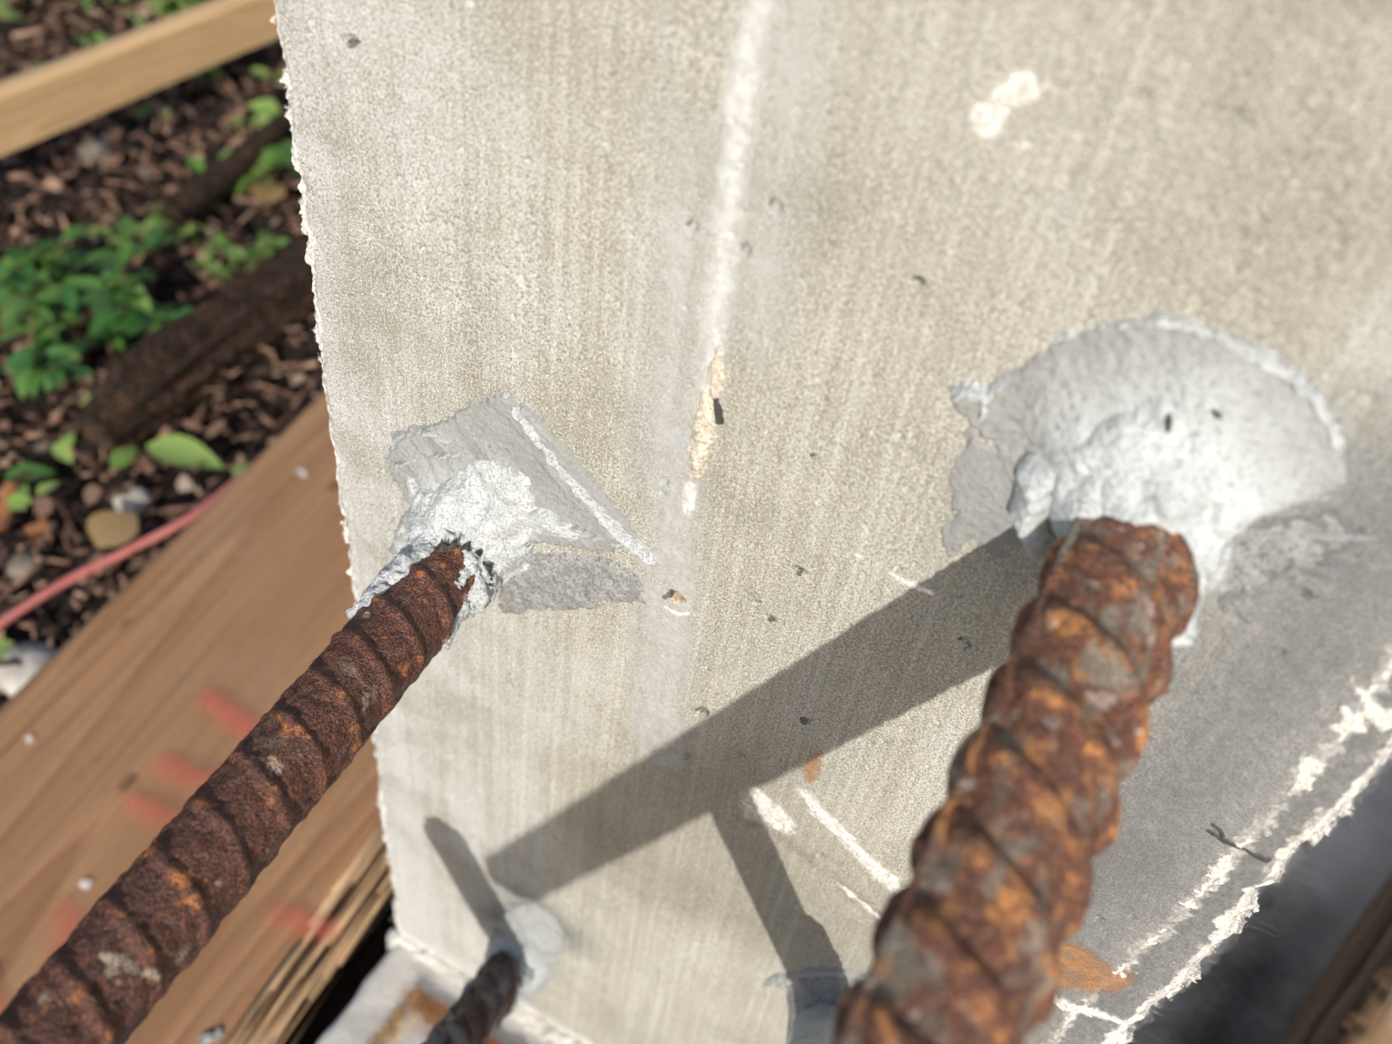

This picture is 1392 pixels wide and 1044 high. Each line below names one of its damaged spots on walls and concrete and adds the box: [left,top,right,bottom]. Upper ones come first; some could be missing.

spalling [684,346,726,510]
spalling [0,0,584,1044]
spalling [662,589,689,615]
spalling [800,514,1392,1044]
crack [1206,823,1272,863]
corrosion [1058,942,1127,994]
corrosion [376,989,449,1044]